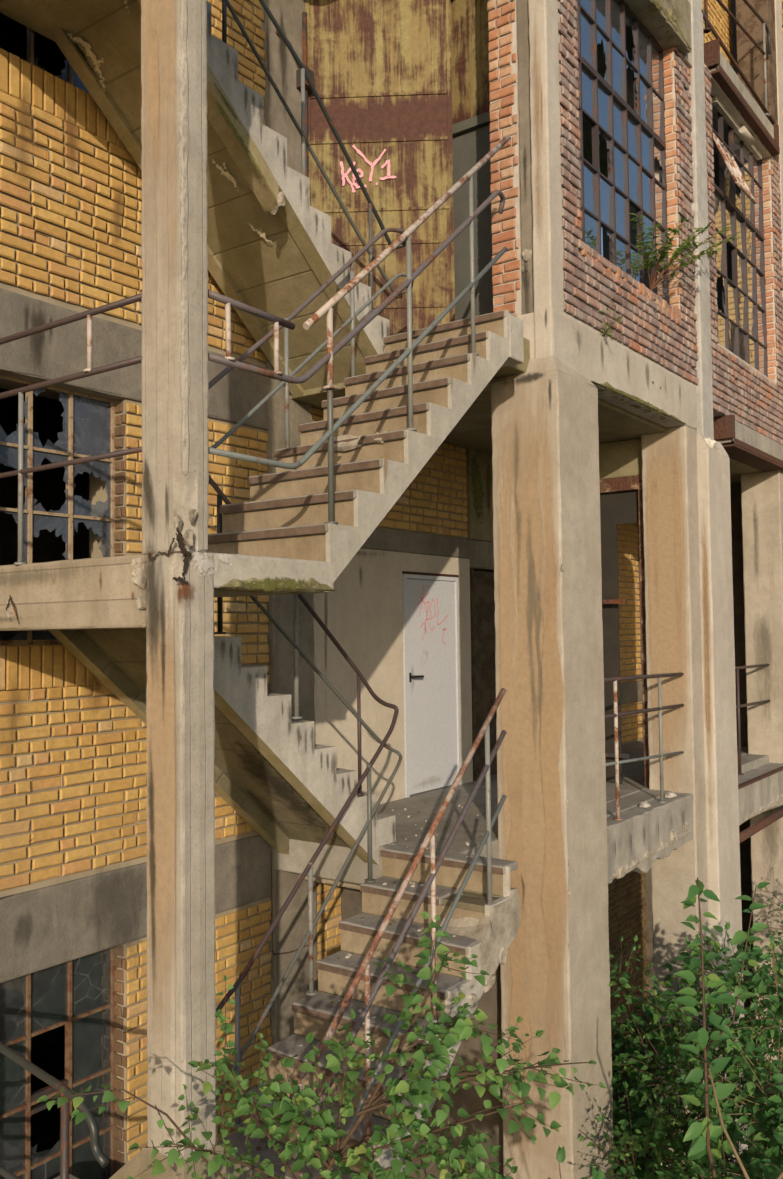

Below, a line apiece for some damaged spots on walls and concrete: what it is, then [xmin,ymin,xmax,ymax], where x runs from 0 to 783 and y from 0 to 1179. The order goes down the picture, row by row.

damp [516,373,551,403]
crack [151,527,192,585]
damp [238,742,325,831]
damp [282,705,356,790]
damp [487,438,568,1076]
spalling [437,888,521,1009]